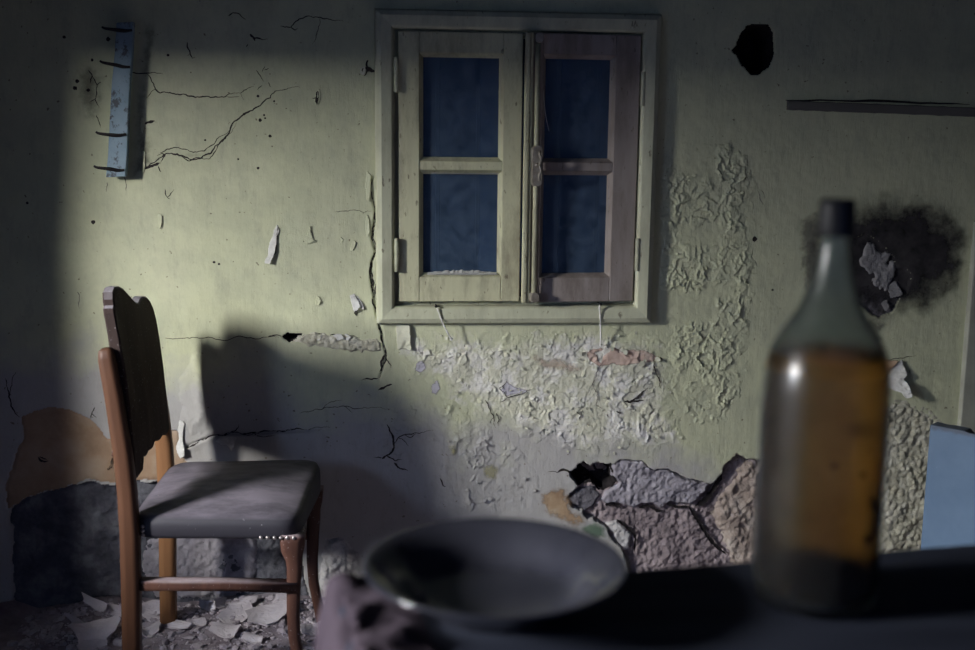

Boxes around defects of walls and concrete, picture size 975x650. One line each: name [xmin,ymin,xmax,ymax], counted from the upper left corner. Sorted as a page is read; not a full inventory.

crack [106,67,298,199]
crack [167,181,430,471]
peeling [293,140,759,572]
flaking render [859,242,903,317]
leakage [850,204,963,315]
flaking render [6,407,121,608]
flaking render [136,442,157,508]
flaking render [141,537,159,577]
flaking render [172,420,186,465]
flaking render [177,591,276,602]
flaking render [177,538,287,579]
flaking render [880,360,943,552]